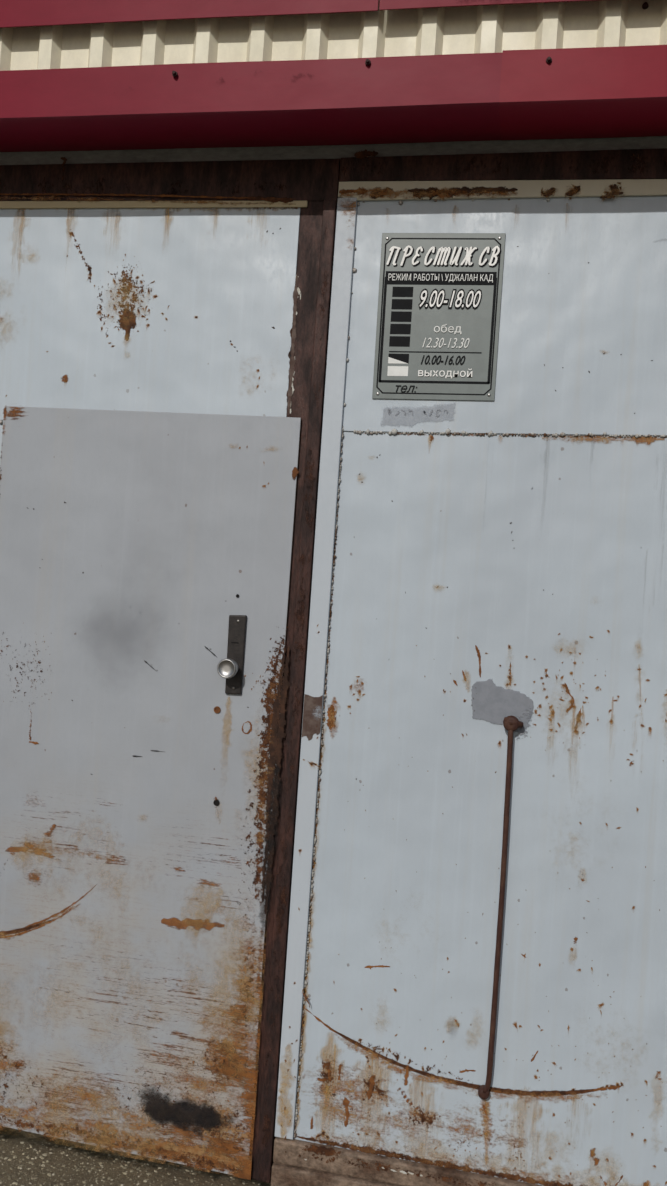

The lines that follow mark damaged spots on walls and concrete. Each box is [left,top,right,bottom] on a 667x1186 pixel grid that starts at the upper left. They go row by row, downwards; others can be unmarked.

corrosion [97,254,169,347]
corrosion [542,435,666,445]
corrosion [316,532,365,768]
corrosion [443,645,488,693]
corrosion [533,649,619,744]
corrosion [0,787,266,1180]
corrosion [280,783,598,1186]